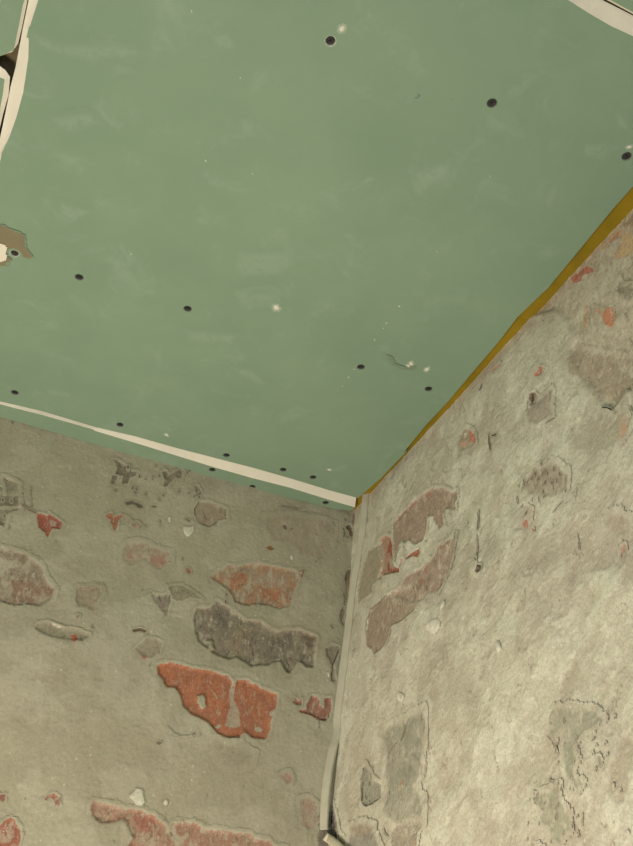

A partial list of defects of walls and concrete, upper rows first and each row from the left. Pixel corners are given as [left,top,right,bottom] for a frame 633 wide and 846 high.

spalling [522,209,633,420]
spalling [523,383,557,429]
crack [601,383,633,411]
spalling [0,473,66,544]
flaking render [0,543,107,643]
flaking render [330,484,459,658]
flaking render [130,554,342,744]
flaking render [0,814,24,846]
flaking render [86,788,289,846]